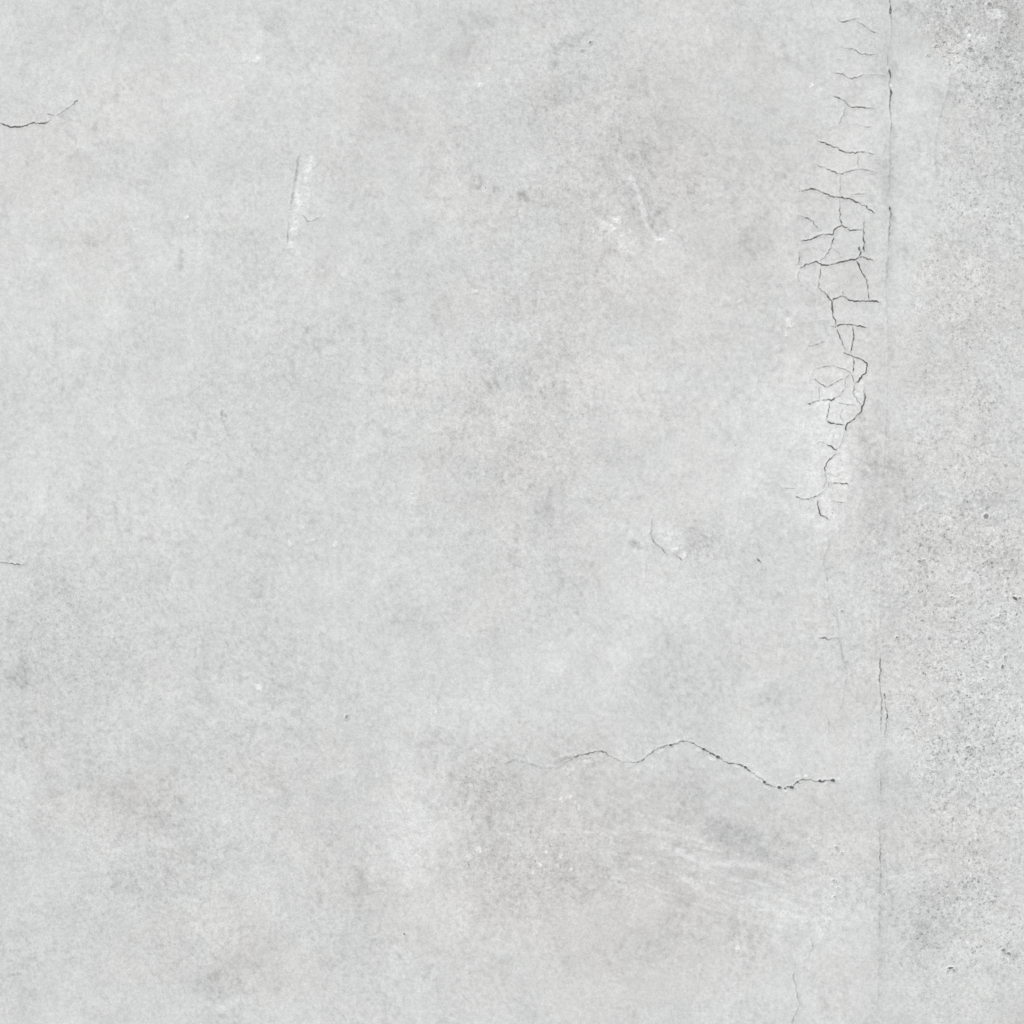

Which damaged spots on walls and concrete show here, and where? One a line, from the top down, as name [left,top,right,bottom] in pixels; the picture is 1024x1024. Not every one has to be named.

crack [0,98,80,130]
crack [781,0,896,521]
crack [876,515,890,737]
crack [503,736,842,794]